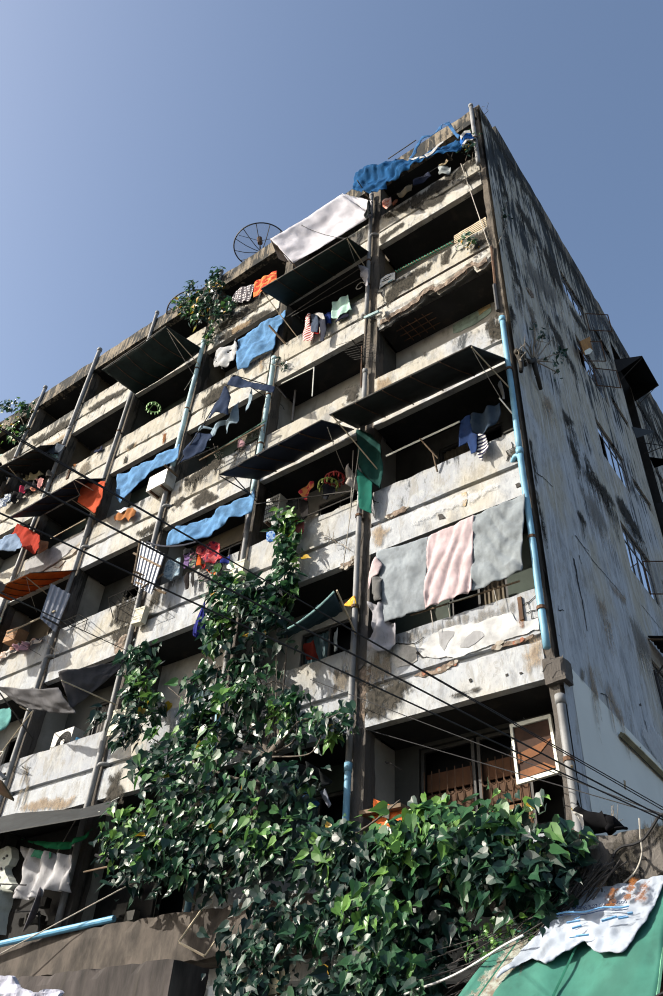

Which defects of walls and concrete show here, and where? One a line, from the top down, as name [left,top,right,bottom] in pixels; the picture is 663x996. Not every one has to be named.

water stain [480,111,626,387]
water stain [639,394,663,447]
water stain [136,435,247,537]
water stain [544,395,651,565]
water stain [398,603,514,642]
flaking render [393,612,540,678]
water stain [361,653,412,720]
water stain [581,666,625,732]
water stain [17,766,75,811]
water stain [104,769,124,804]